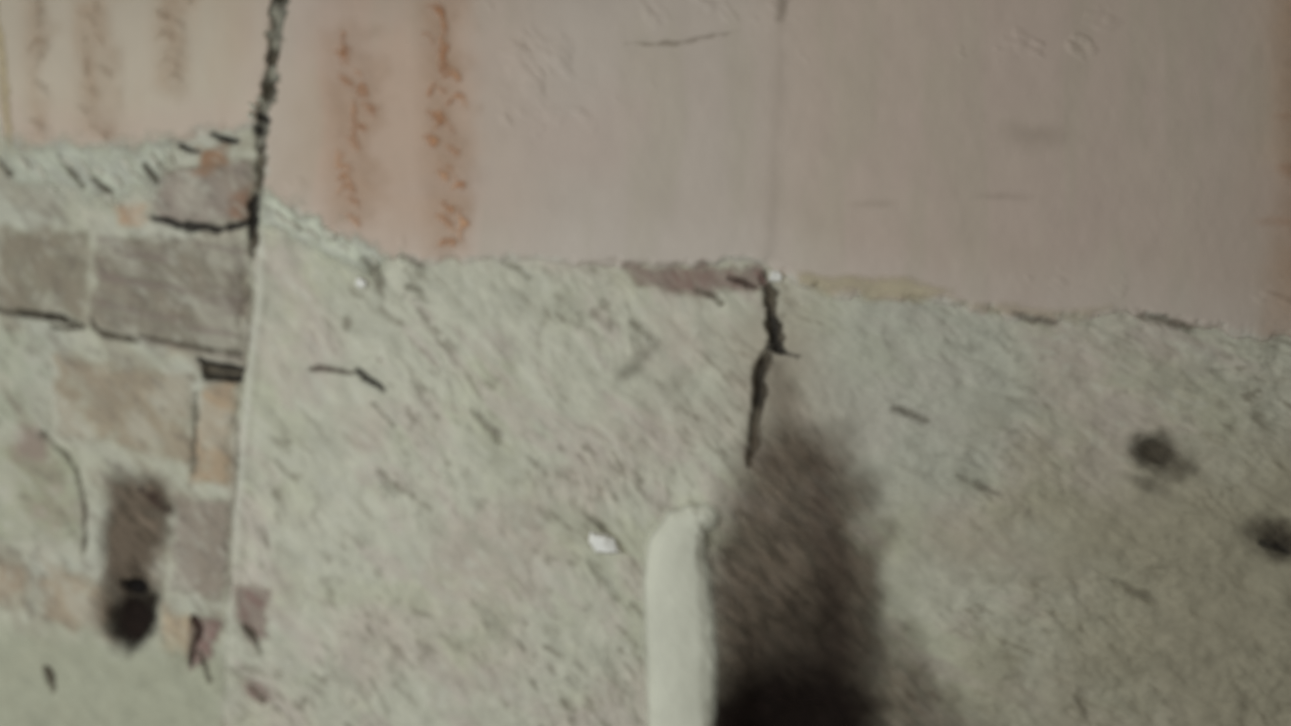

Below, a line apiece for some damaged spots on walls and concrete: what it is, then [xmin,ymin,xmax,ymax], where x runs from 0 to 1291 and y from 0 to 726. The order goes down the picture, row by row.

spalling [2,139,175,202]
crack [151,0,289,250]
spalling [260,190,385,289]
spalling [632,265,784,298]
crack [747,271,790,467]